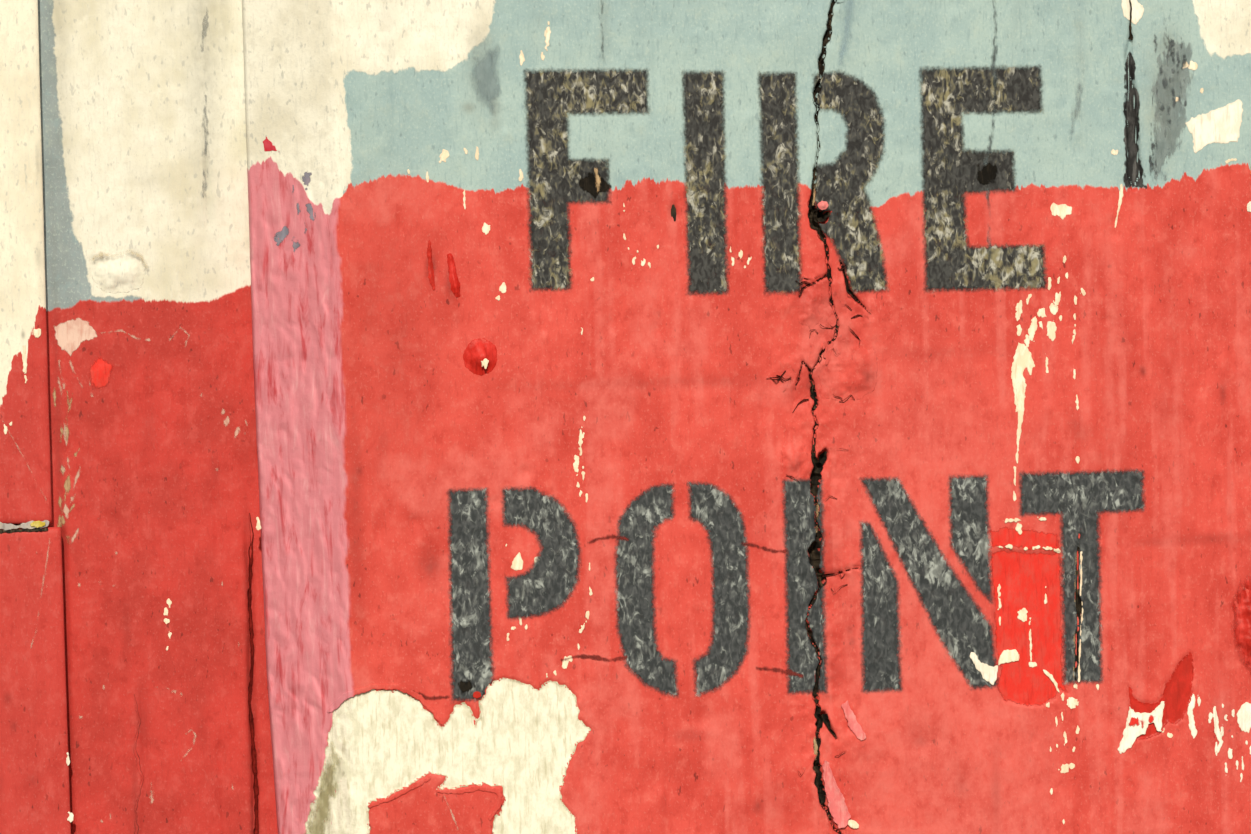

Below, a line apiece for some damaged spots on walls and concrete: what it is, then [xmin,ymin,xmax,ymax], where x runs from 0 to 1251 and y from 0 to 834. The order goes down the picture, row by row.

peeling [573,416,588,503]
crack [742,0,871,834]
peeling [1011,256,1086,501]
peeling [305,611,591,834]
peeling [970,517,1080,773]
peeling [1117,651,1251,782]